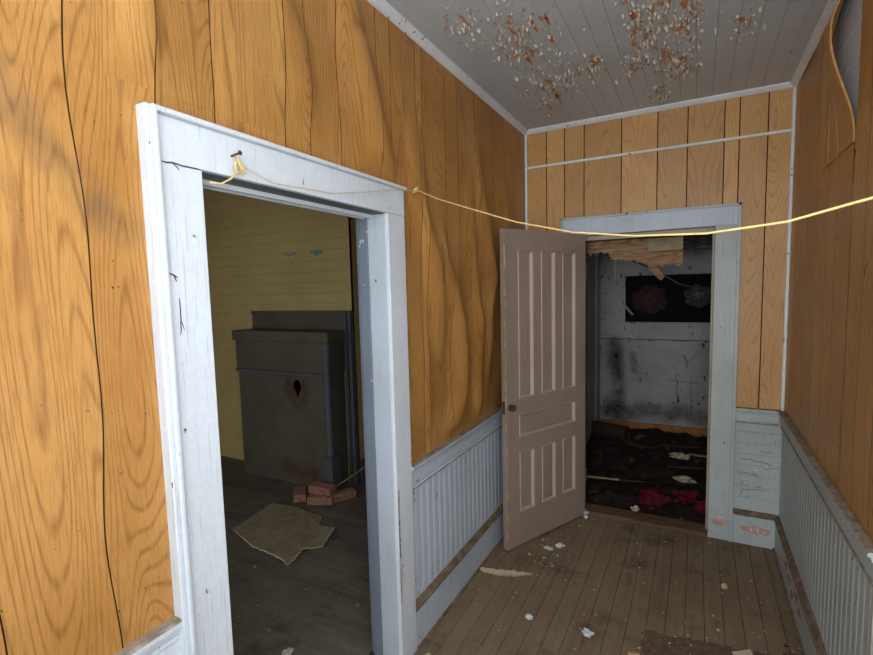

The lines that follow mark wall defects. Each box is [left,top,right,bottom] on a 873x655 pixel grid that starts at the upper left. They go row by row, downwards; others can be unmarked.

peeling [434,0,766,124]